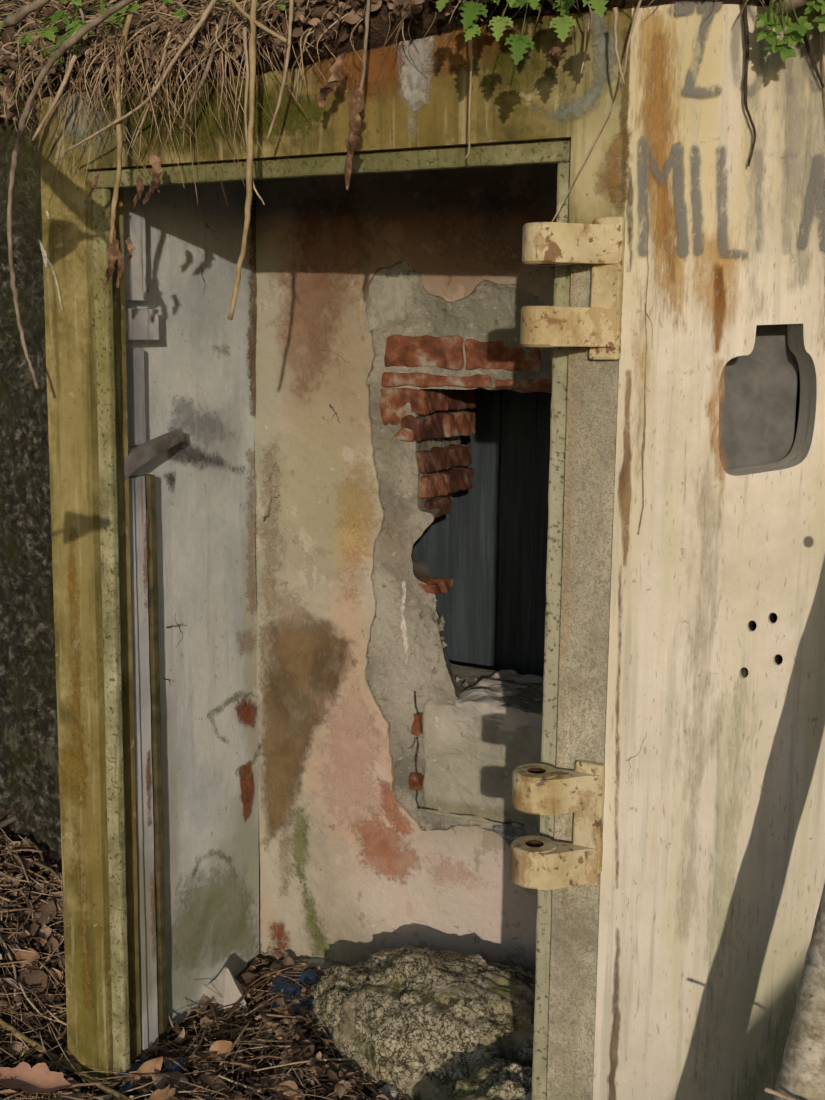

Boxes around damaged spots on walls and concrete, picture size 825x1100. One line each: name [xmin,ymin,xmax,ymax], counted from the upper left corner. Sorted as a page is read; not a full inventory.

rust [597,12,735,351]
peeling [246,444,280,687]
flaking render [365,261,552,845]
water stain [242,594,353,889]